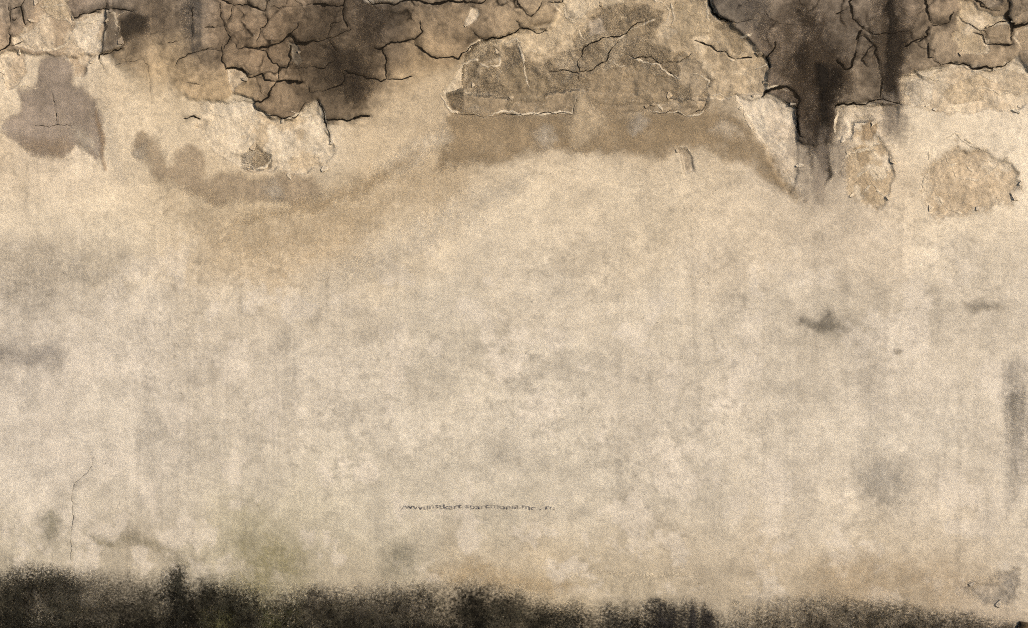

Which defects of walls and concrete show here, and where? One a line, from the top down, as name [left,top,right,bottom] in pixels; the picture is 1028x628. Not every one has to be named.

crack [0,0,29,51]
leakage [1,56,106,169]
peeling [0,0,124,90]
peeling [195,66,335,180]
crack [168,0,563,138]
leakage [134,90,793,211]
peeling [441,0,804,195]
crack [456,20,803,138]
leakage [880,0,906,134]
peeling [834,0,1028,218]
crack [835,0,1028,108]
leakage [0,567,988,628]